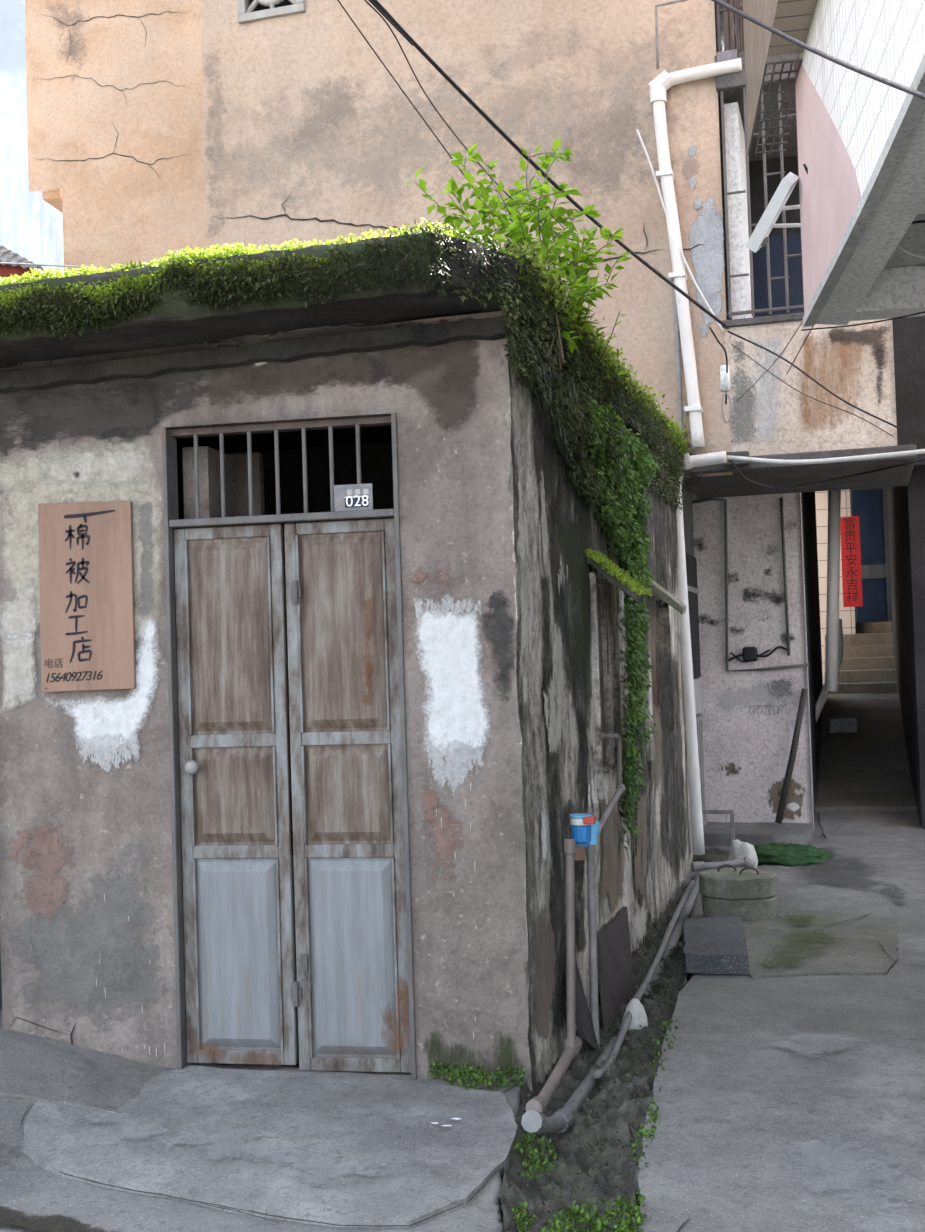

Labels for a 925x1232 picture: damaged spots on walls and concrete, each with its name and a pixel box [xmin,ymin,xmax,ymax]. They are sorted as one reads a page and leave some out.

crack [33,11,192,175]
crack [211,195,422,232]
spalling [683,146,725,337]
water stain [728,340,780,444]
water stain [828,327,888,404]
peeling [0,442,163,641]
water stain [640,473,703,623]
water stain [529,360,628,1035]
water stain [628,644,687,908]